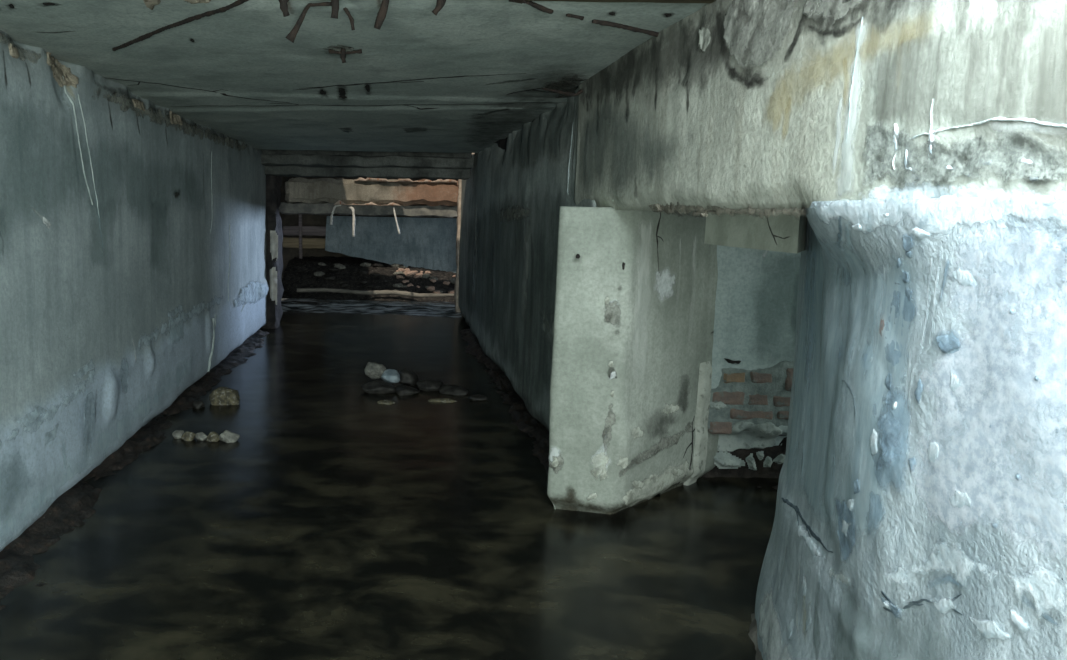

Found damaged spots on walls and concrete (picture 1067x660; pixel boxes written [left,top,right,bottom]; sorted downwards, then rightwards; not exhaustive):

spalling [0,33,79,88]
damp [582,12,724,132]
flaking render [698,0,863,88]
damp [63,77,103,245]
flaking render [649,124,1067,562]
flaking render [591,358,794,507]
crack [782,498,833,558]
flaking render [888,543,989,586]
spalling [881,591,923,620]
flaking render [936,598,955,613]
flaking render [972,611,1029,640]
flaking render [1008,568,1067,625]